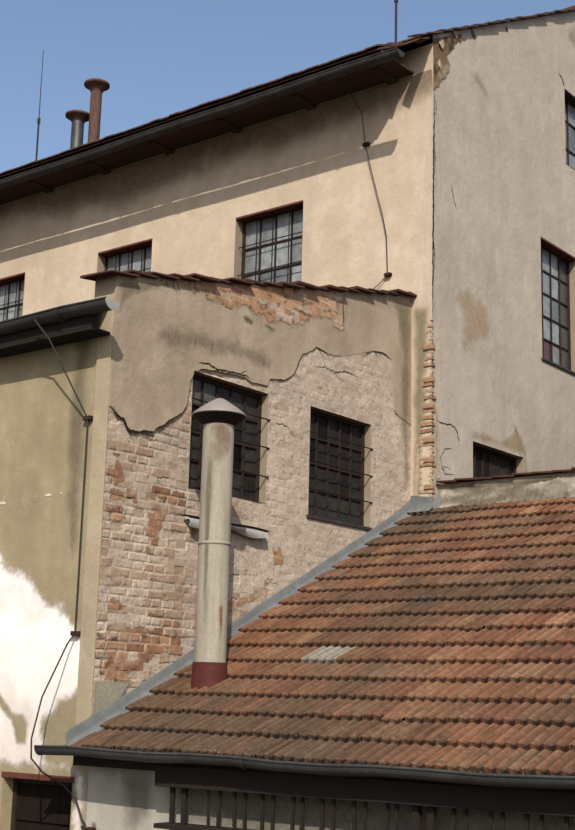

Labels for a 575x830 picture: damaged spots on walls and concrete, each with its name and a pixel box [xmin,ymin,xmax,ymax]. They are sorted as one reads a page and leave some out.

spalling [391,29,476,89]
crack [432,89,456,310]
flaking render [161,279,344,330]
crack [190,362,252,382]
crack [272,347,357,381]
crack [113,407,181,438]
crack [437,420,458,475]
peeling [92,318,440,716]
peeling [0,555,80,769]
peeling [71,771,84,830]